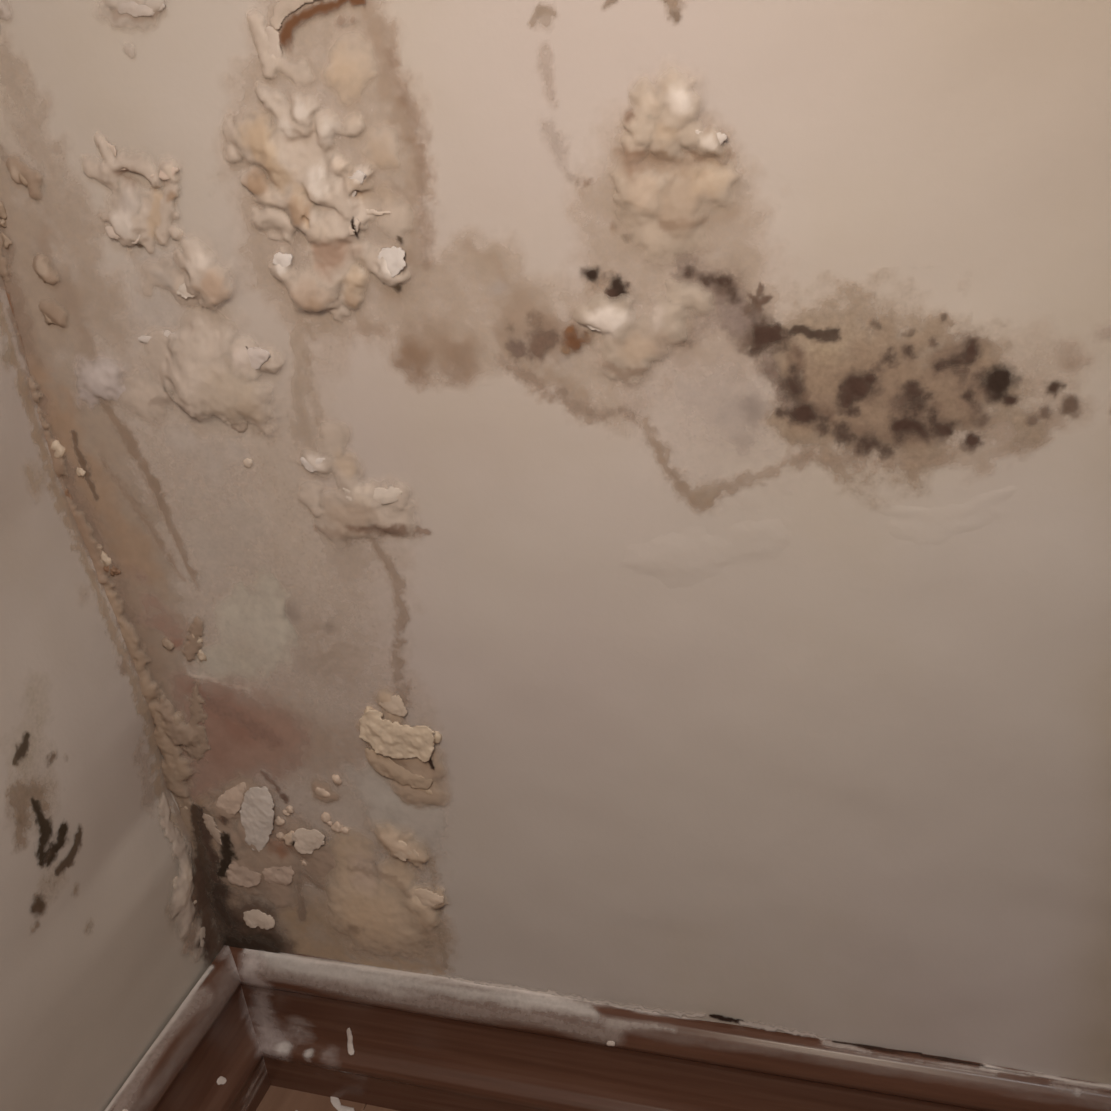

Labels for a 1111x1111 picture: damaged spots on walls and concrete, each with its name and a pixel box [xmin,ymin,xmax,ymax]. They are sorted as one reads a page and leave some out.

flaking render [6,156,42,200]
peeling [83,134,181,253]
peeling [100,0,166,28]
peeling [222,0,412,320]
peeling [576,282,711,380]
water stain [240,0,1085,511]
water stain [0,49,450,975]
peeling [29,377,447,960]